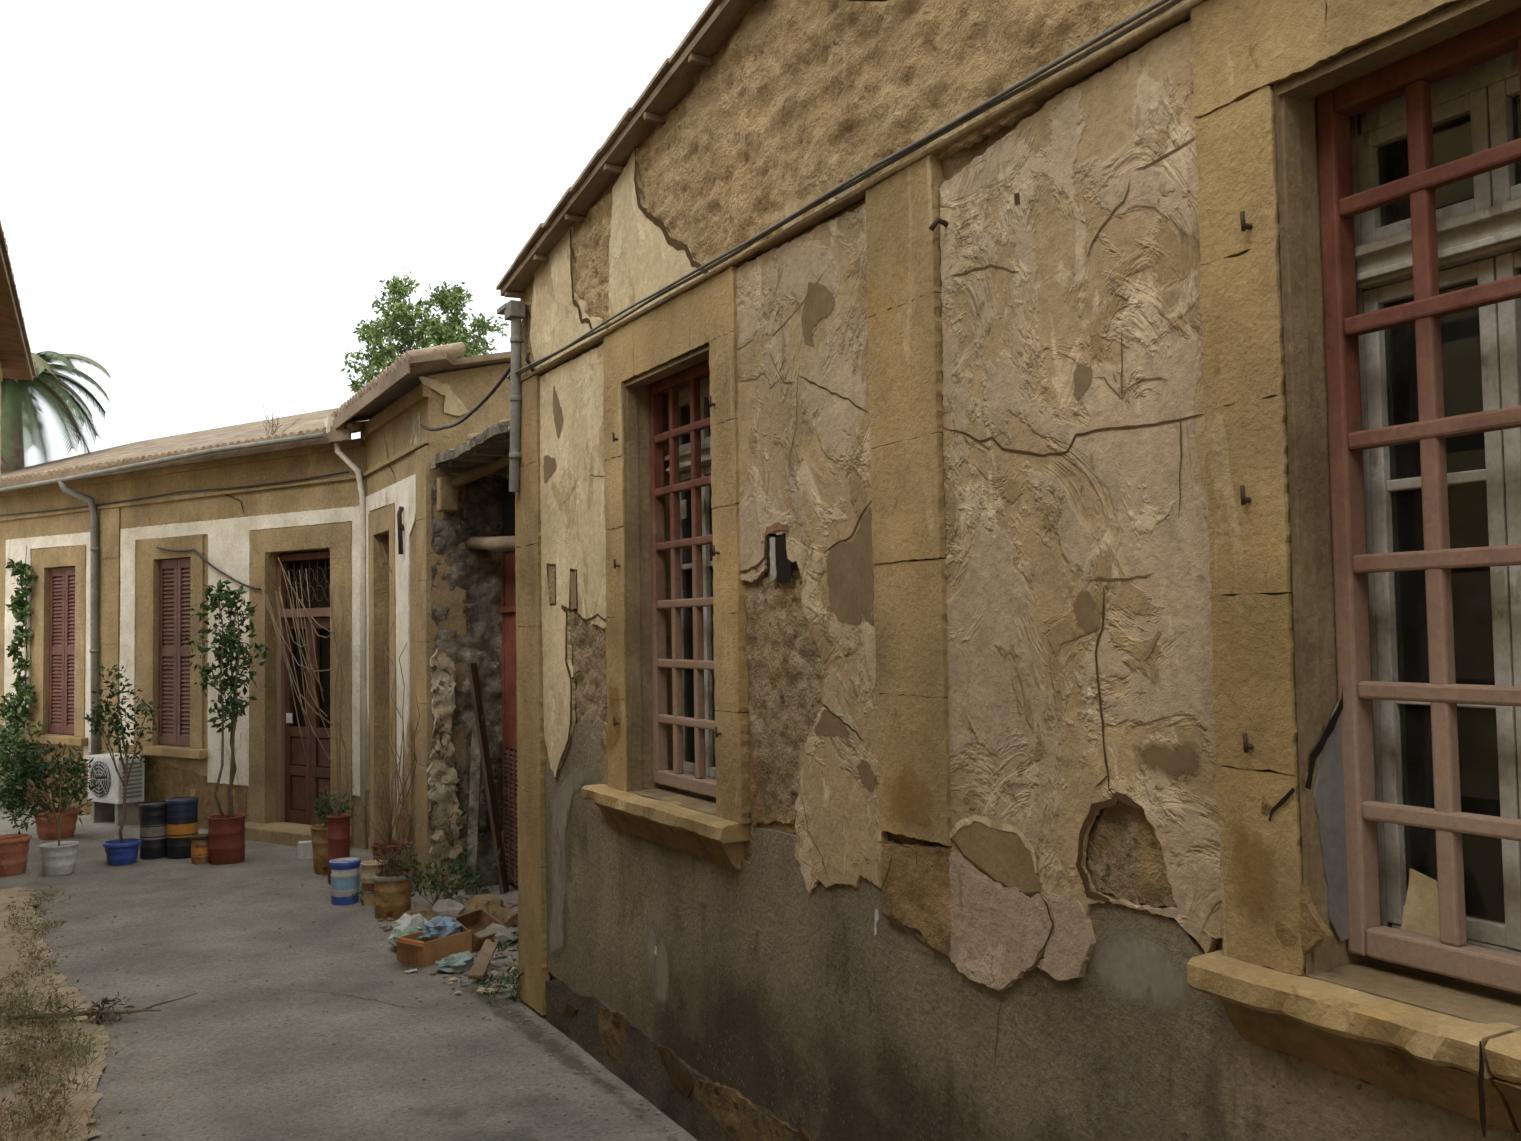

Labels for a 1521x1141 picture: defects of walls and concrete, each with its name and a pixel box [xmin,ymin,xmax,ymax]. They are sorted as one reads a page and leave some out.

crack [738,270,869,480]
peeling [801,282,834,347]
crack [944,333,1205,518]
peeling [827,508,874,626]
spalling [569,611,608,753]
crack [1085,573,1153,797]
peeling [856,759,876,792]
peeling [881,792,1177,991]
water stain [655,888,1052,1141]
spalling [657,1045,765,1141]
crack [1477,1041,1486,1137]